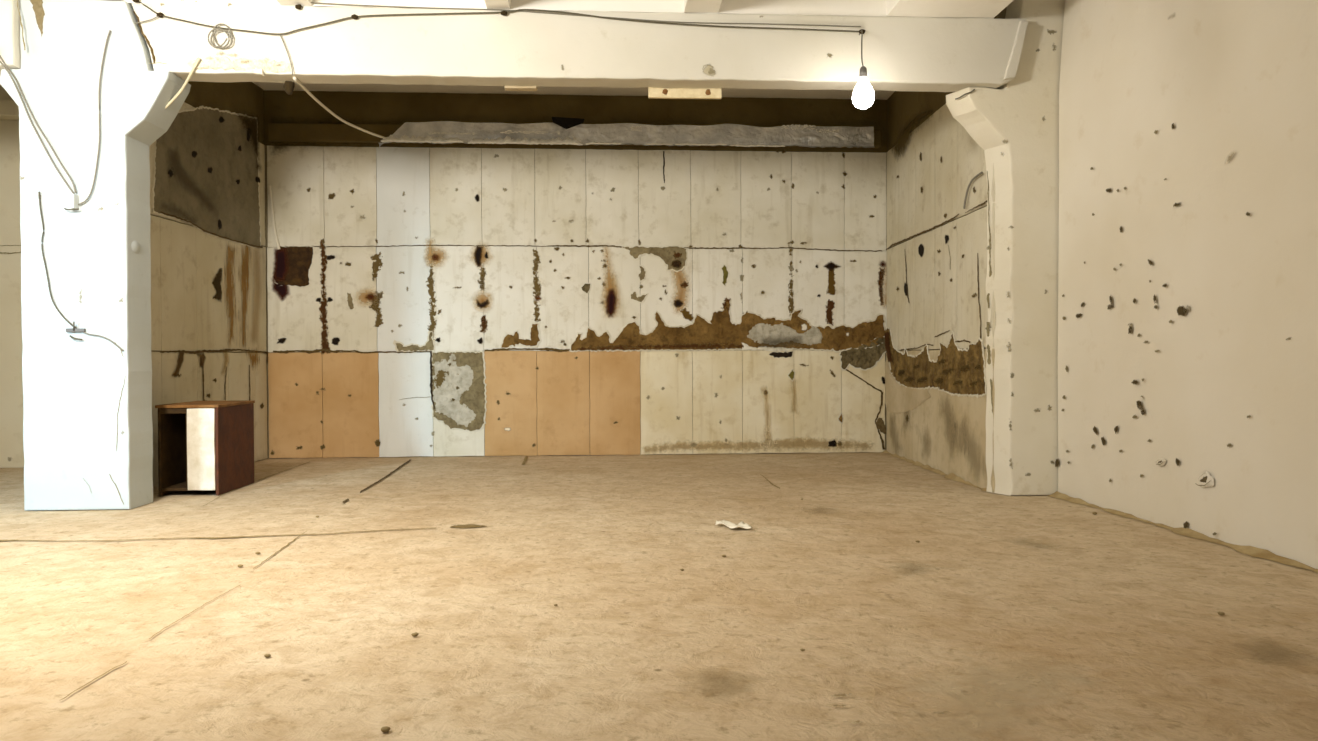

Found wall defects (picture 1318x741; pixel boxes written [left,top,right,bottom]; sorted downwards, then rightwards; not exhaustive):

peeling [178,106,258,133]
flaking render [272,244,315,300]
rust [316,240,340,354]
spalling [346,252,511,432]
rust [473,246,488,267]
rust [476,294,490,308]
spalling [500,239,607,349]
rust [604,253,618,317]
rust [673,263,694,321]
spalling [561,233,987,398]
rust [815,262,840,326]
spalling [896,214,964,302]